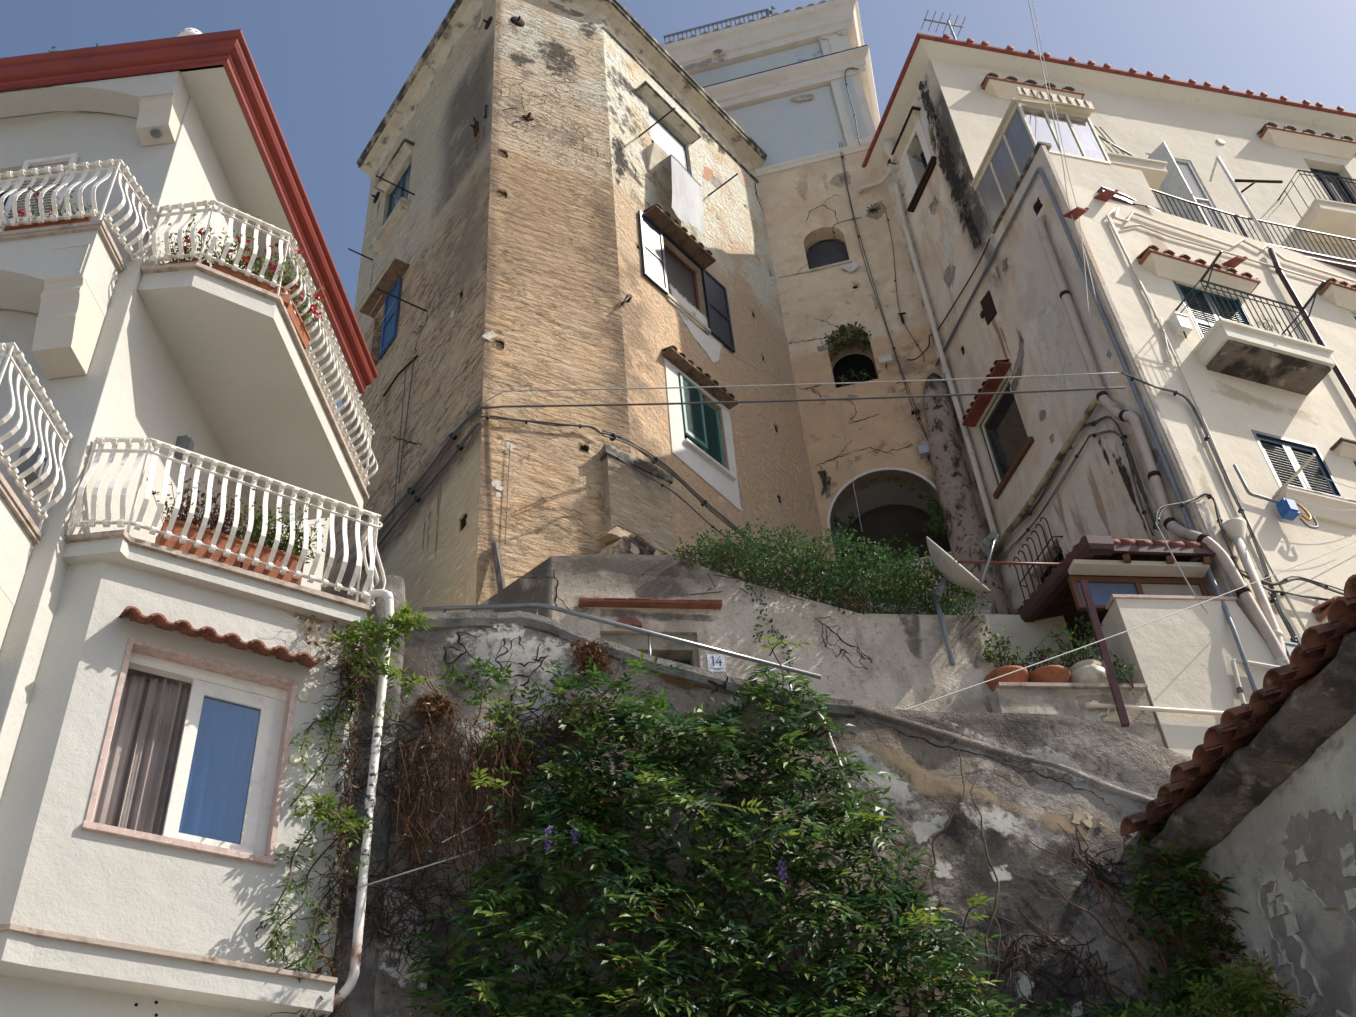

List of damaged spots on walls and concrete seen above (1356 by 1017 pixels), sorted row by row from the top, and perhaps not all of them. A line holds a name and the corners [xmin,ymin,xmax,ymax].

damp [919,81,981,265]
crack [801,385,917,479]
crack [862,715,1114,807]
crack [1076,828,1126,885]
peeling [1245,807,1356,1007]